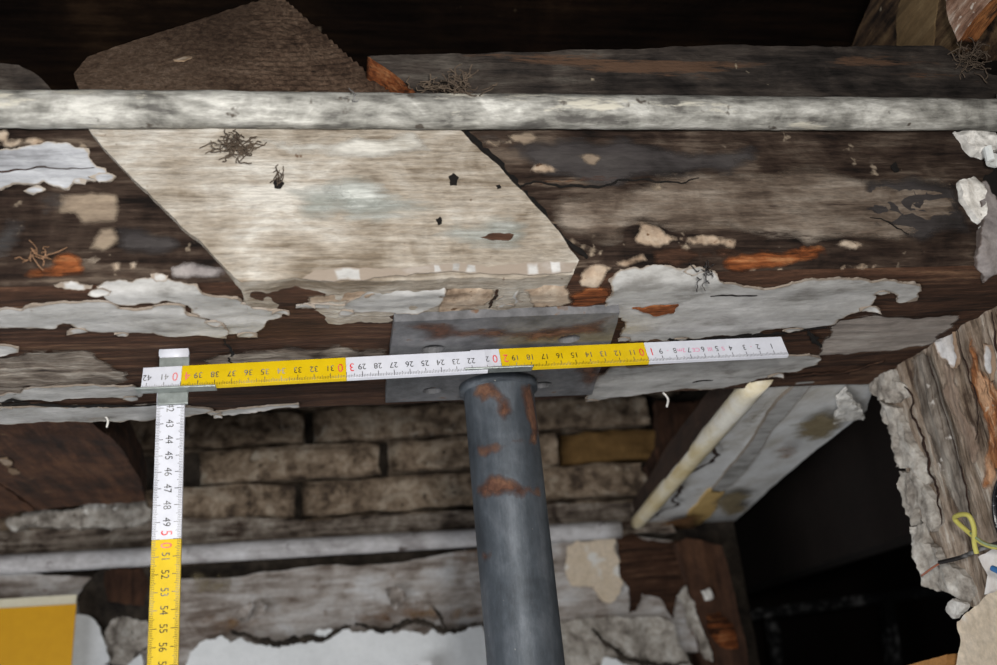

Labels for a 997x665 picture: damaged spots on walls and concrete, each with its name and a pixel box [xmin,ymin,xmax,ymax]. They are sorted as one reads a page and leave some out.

peeling [0,141,116,195]
peeling [0,261,577,339]
corrosion [415,321,602,340]
peeling [0,344,19,357]
peeling [585,264,979,463]
peeling [983,343,996,381]
peeling [0,383,157,425]
peeling [185,402,299,419]
corrosion [475,383,510,416]
corrosion [479,477,539,496]
spalling [560,533,713,665]